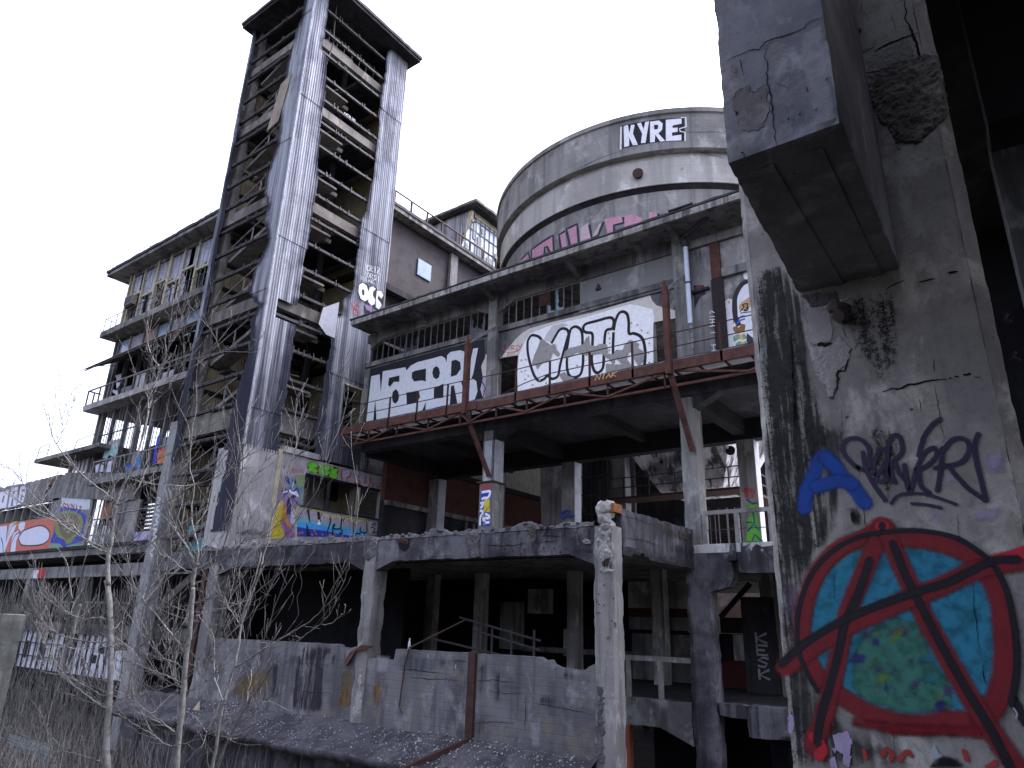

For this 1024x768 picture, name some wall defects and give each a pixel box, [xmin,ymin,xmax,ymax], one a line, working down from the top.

crack [862,0,921,56]
peeling [732,75,788,133]
crack [727,17,824,145]
spalling [863,39,950,145]
spalling [801,291,852,399]
water stain [850,294,897,379]
crack [883,359,980,436]
water stain [758,267,843,655]
spalling [583,528,695,614]
water stain [292,648,335,710]
water stain [787,667,881,765]